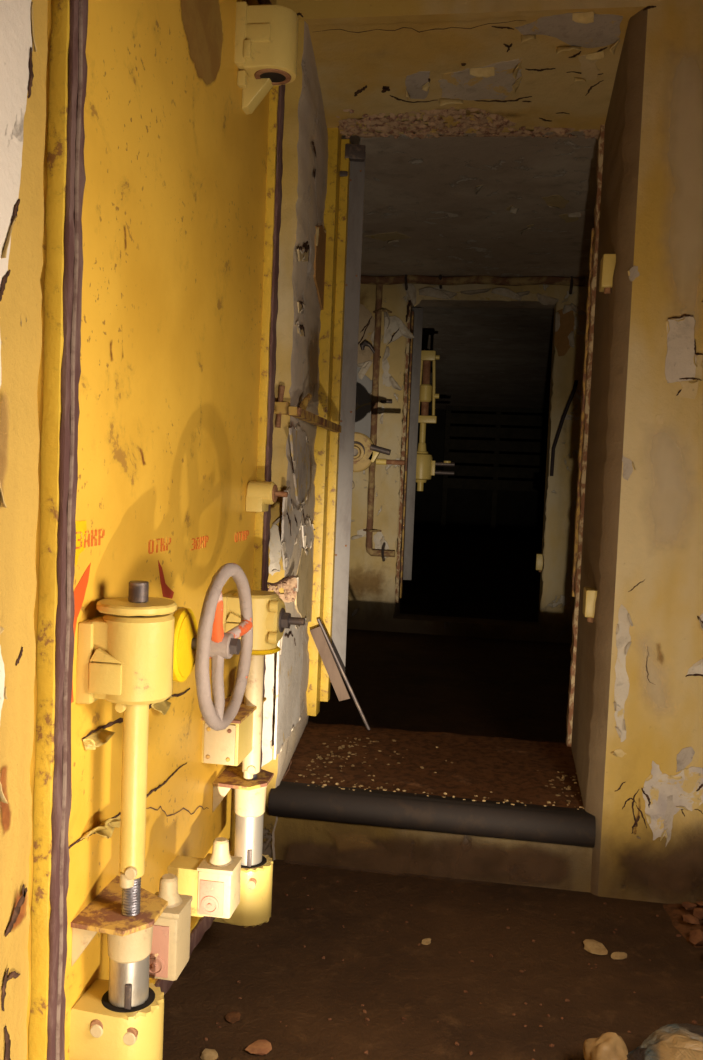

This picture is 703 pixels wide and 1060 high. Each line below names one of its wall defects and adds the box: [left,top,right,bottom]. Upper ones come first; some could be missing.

crack [354,78,436,103]
crack [297,12,523,52]
crack [474,47,607,122]
peeling [515,11,623,82]
peeling [0,0,37,301]
peeling [355,304,414,437]
peeling [665,314,703,399]
peeling [261,424,315,767]
peeling [0,626,8,718]
peeling [611,604,633,757]
peeling [685,659,703,677]
peeling [636,746,703,847]